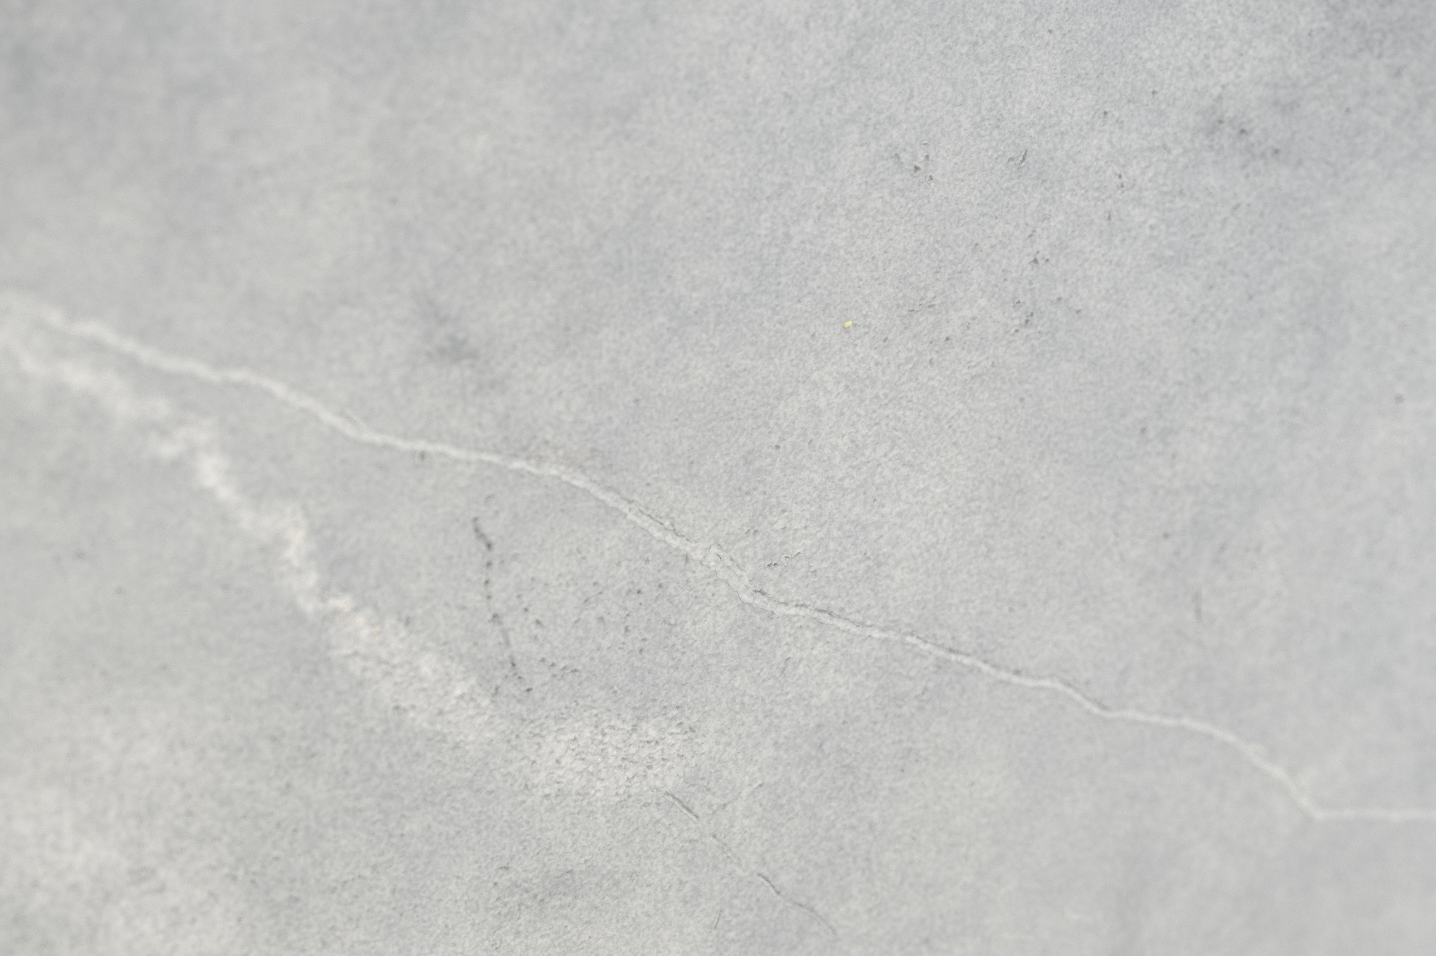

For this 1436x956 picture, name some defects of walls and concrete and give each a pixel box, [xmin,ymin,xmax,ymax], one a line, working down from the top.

crack [0,287,1436,822]